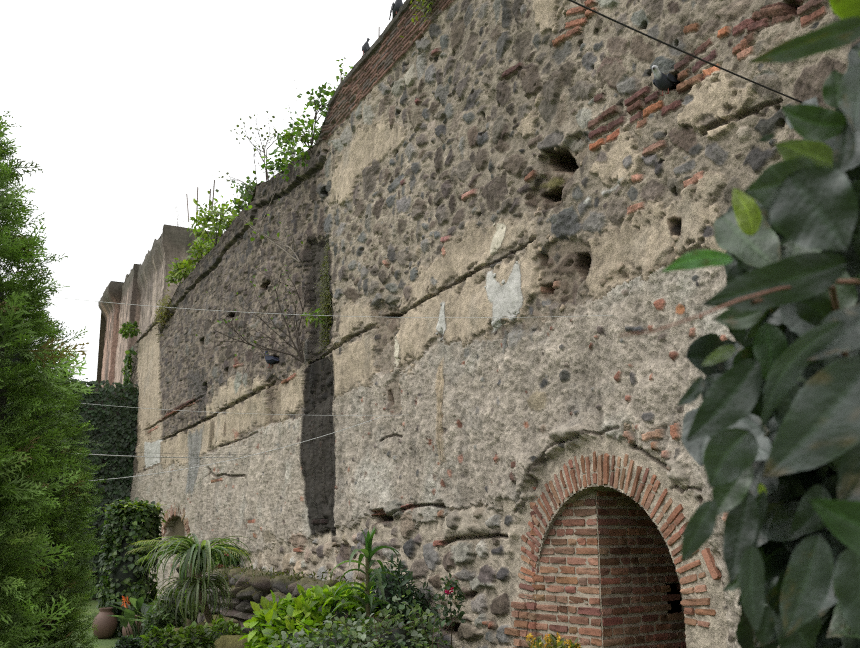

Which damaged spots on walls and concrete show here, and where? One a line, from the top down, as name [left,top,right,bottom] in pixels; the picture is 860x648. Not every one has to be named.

crack [401,238,536,317]
peeling [484,261,523,332]
crack [311,325,376,364]
crack [146,387,271,441]
crack [372,502,446,514]